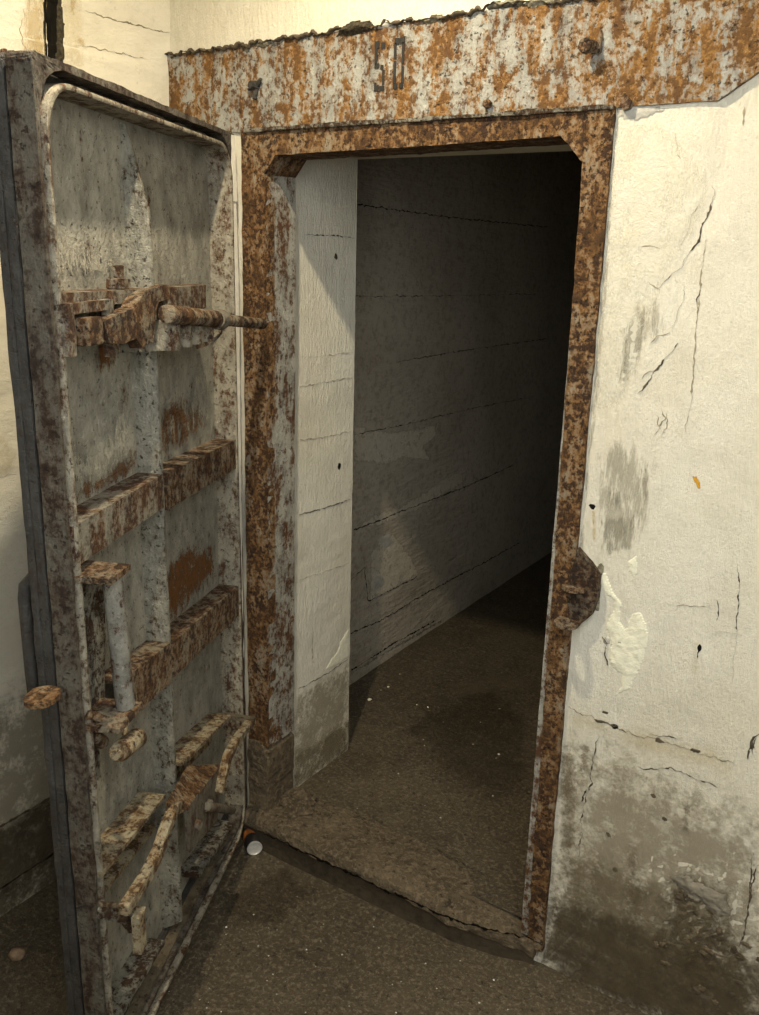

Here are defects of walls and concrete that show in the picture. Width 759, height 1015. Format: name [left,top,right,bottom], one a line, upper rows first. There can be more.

crack [639,187,714,437]
rust [76,451,135,503]
rust [162,398,205,453]
rust [167,546,215,619]
peeling [595,563,649,693]
crack [571,708,759,854]
crack [263,832,543,945]
leakage [544,757,759,1015]
crack [738,856,757,948]